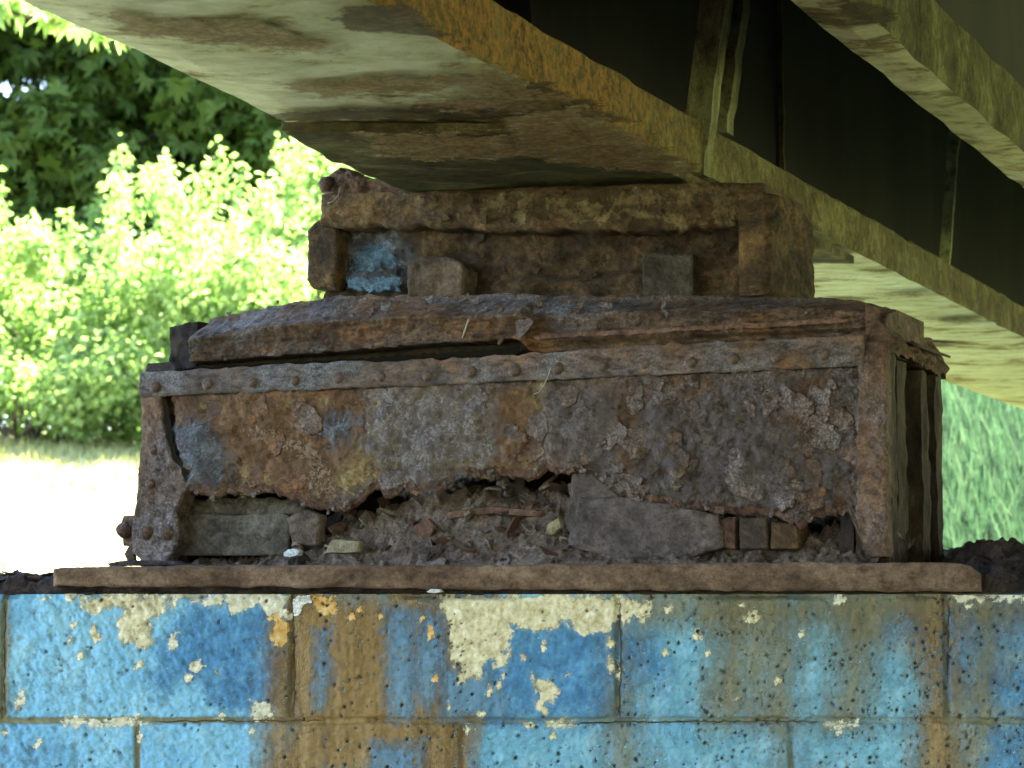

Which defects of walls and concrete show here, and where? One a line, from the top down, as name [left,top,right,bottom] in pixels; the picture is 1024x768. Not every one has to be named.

water stain [281,74,466,99]
rust [145,362,188,372]
crack [187,347,521,370]
rust [187,401,366,501]
peeling [377,468,426,497]
rust [546,517,563,535]
rust [105,544,189,566]
peeling [65,594,293,670]
peeling [439,594,673,697]
peeling [184,658,219,683]
rust [238,590,496,768]
peeling [523,674,577,739]